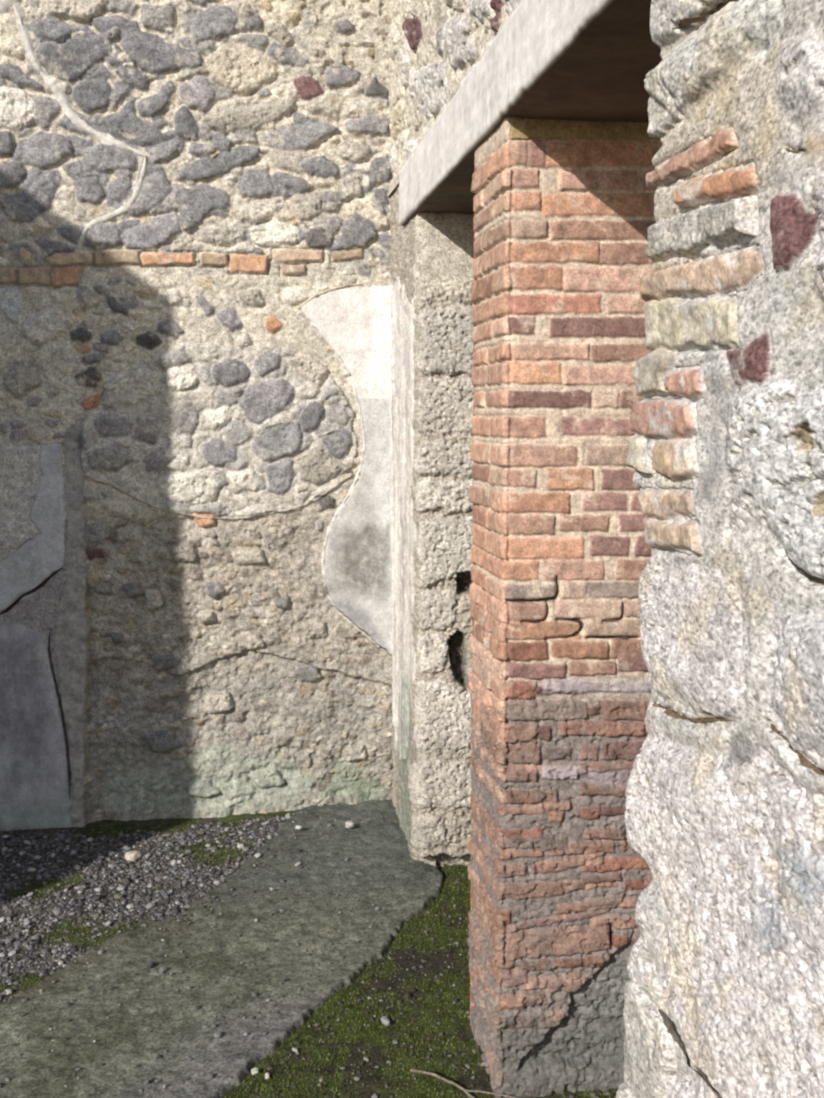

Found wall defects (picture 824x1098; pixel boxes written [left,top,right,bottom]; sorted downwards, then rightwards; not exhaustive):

crack [0,0,147,252]
crack [0,568,62,615]
flaking render [0,443,67,611]
flaking render [0,623,73,830]
crack [48,630,71,801]
spalling [80,263,417,823]
spalling [447,630,464,684]
spalling [456,571,472,591]
spalling [518,937,632,1070]